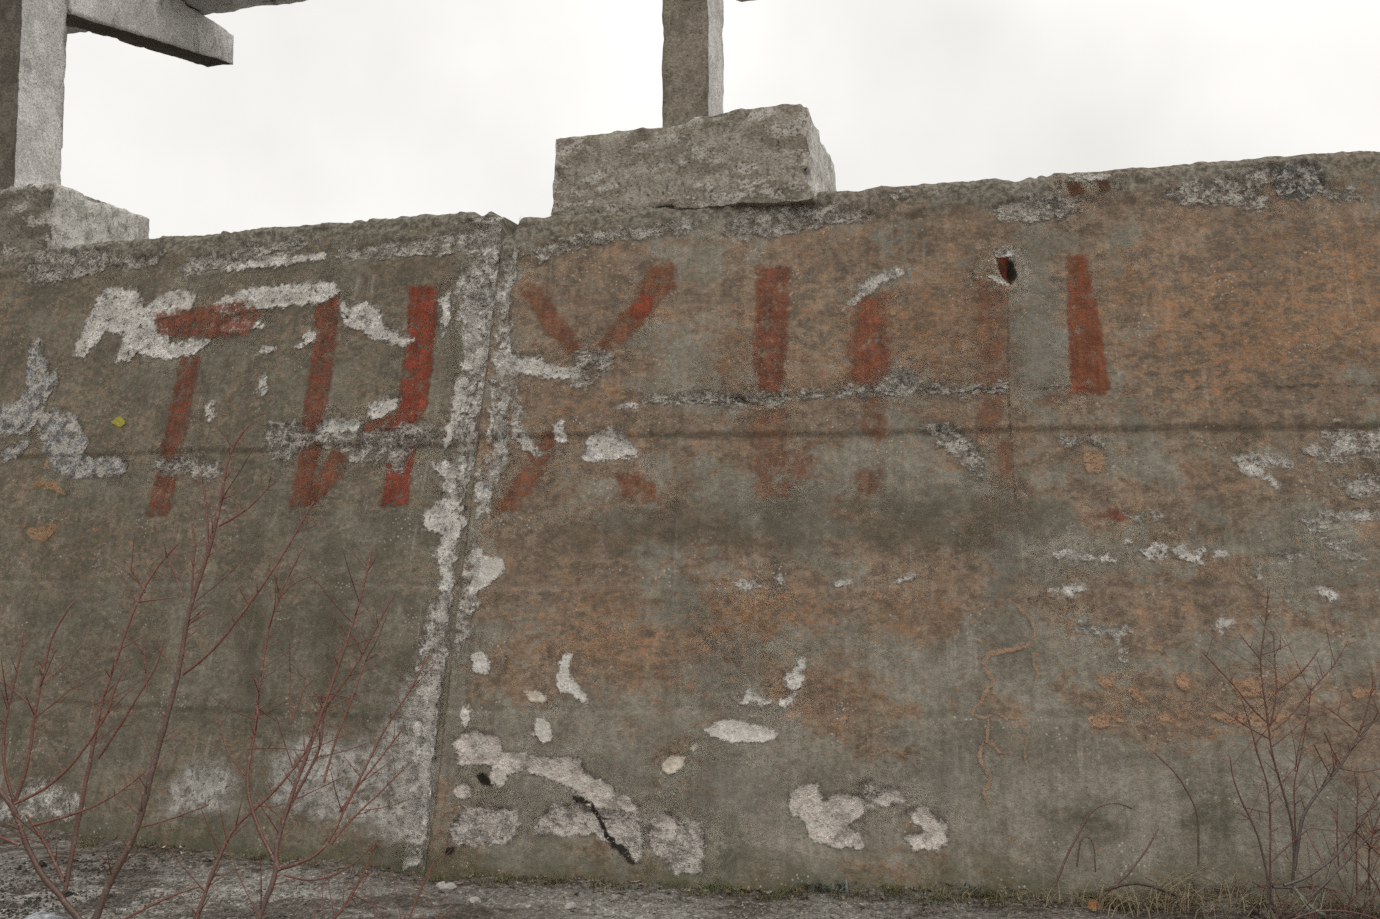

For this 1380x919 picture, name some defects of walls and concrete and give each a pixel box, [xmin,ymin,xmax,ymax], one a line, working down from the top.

spalling [988,245,1017,286]
crack [571,795,635,865]